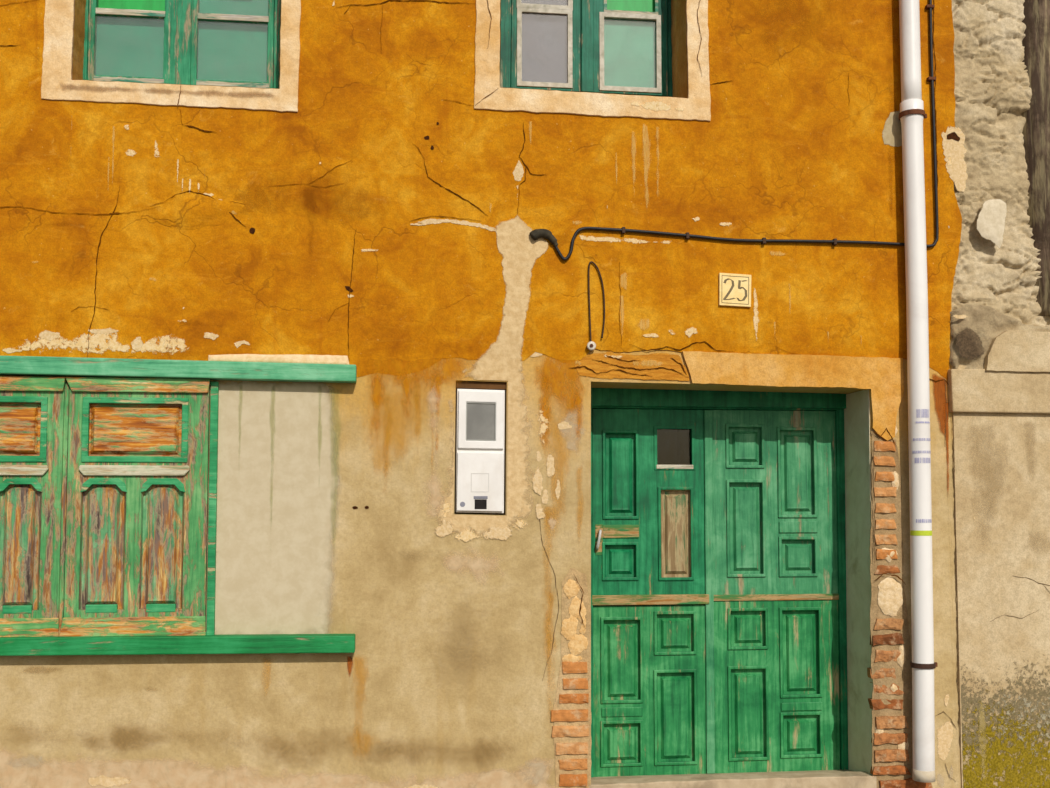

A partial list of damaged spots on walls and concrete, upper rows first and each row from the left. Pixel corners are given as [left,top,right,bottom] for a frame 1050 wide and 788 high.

crack [342,0,492,53]
crack [177,86,217,133]
crack [412,143,488,221]
crack [517,122,545,215]
spalling [941,126,968,192]
peeling [410,219,496,231]
peeling [2,328,189,355]
spalling [953,315,984,359]
peeling [532,404,572,527]
spalling [867,427,933,788]
spalling [551,568,592,788]
damp [961,662,1050,777]